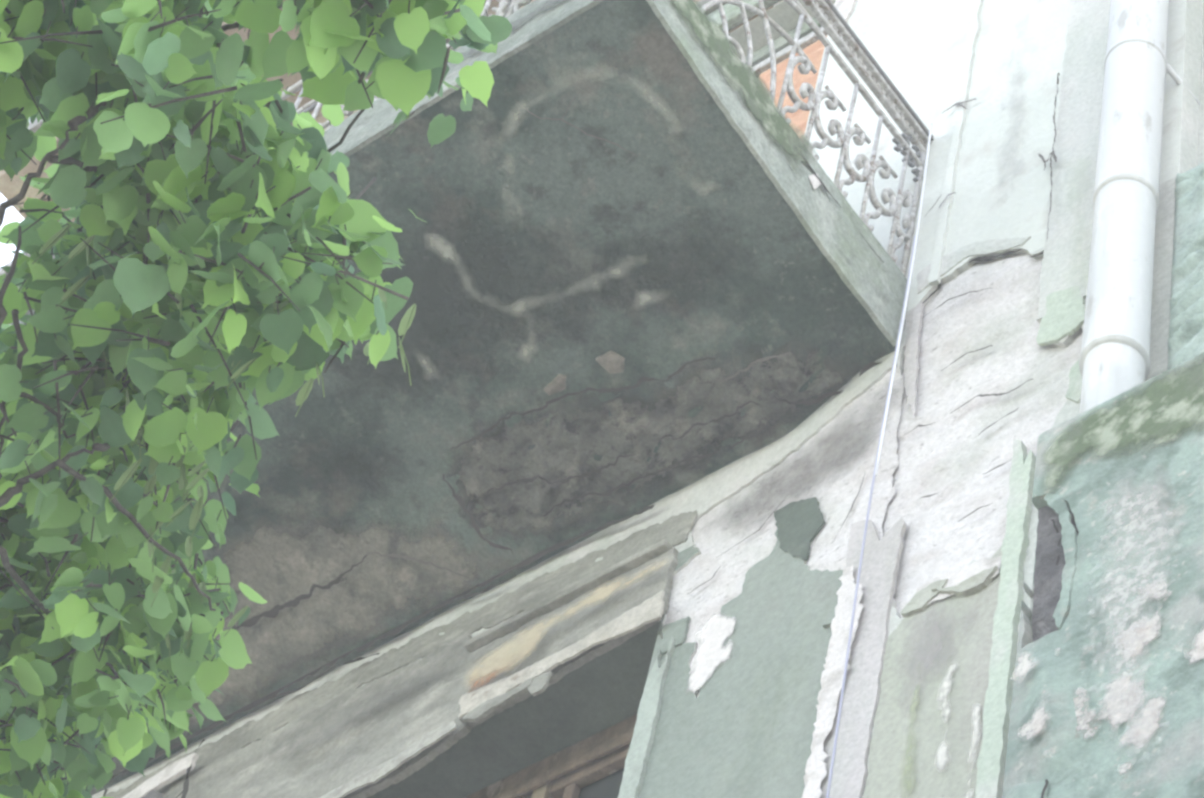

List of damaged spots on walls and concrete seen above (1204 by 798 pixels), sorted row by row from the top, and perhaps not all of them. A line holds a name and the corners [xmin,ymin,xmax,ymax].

crack [943,98,976,113]
crack [968,73,1060,263]
spalling [186,236,1085,798]
crack [93,505,654,798]
peeling [1114,580,1168,660]
peeling [1187,630,1204,662]
peeling [1074,674,1165,747]
crack [1040,779,1048,798]